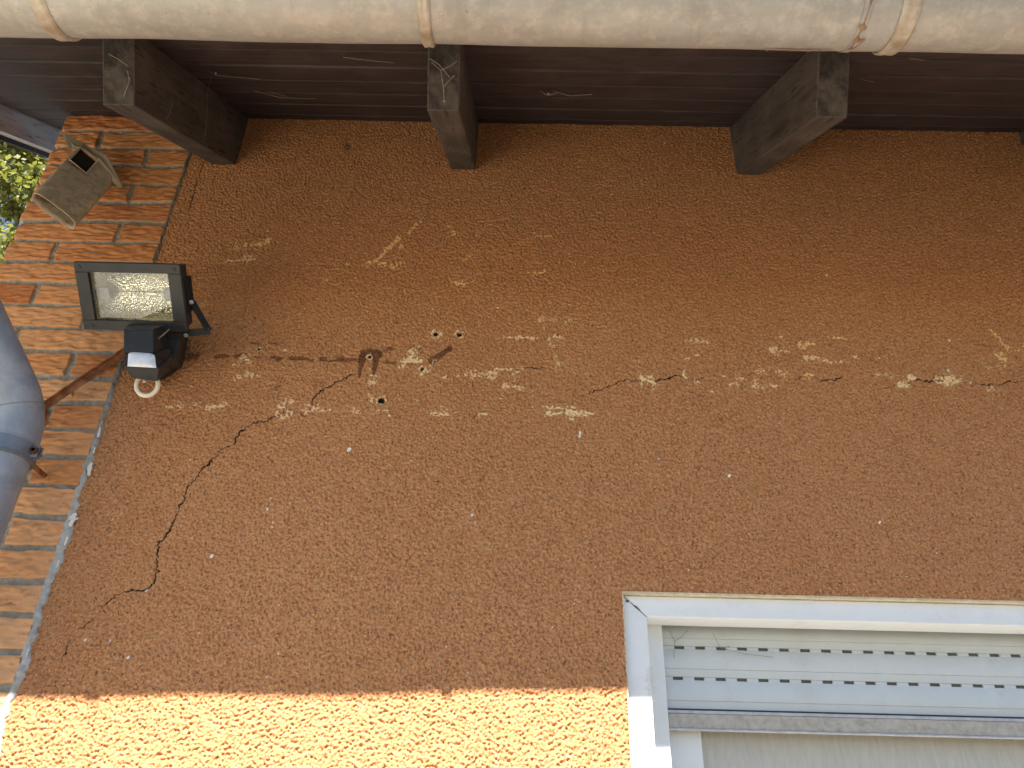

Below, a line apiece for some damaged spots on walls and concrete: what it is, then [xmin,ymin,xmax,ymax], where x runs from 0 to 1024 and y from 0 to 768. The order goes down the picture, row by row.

peeling [398,345,524,391]
crack [575,375,704,397]
spalling [875,372,917,388]
spalling [934,368,971,387]
peeling [542,405,594,421]
crack [55,374,352,690]